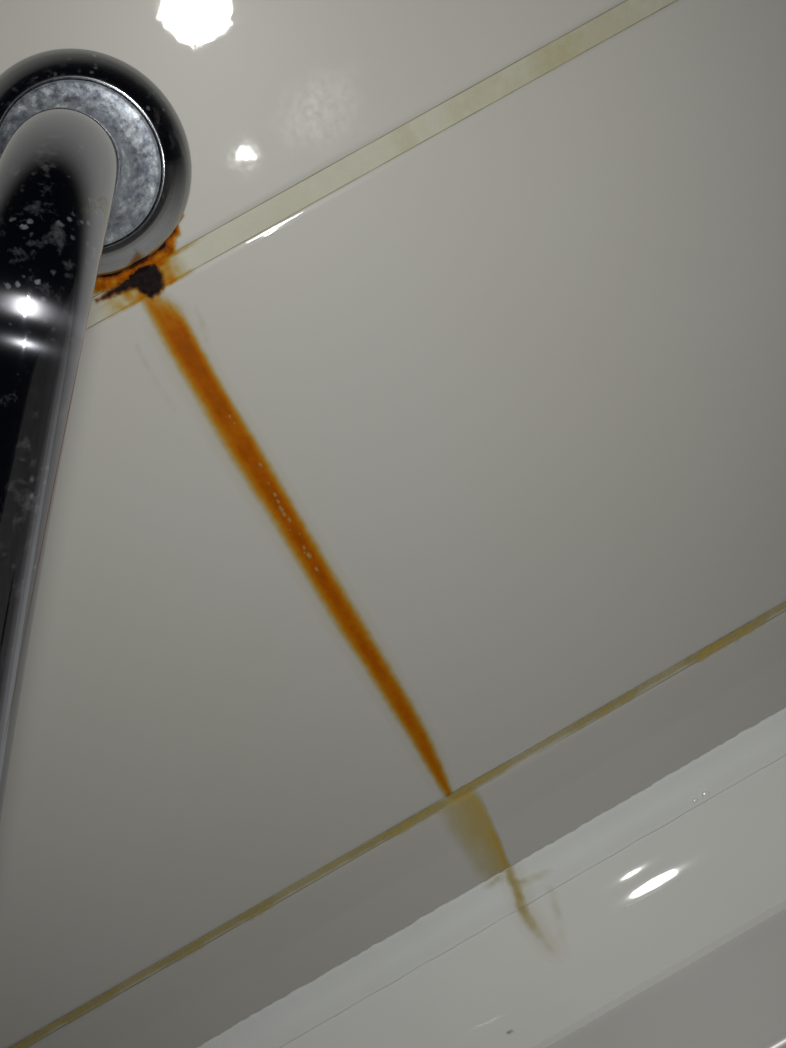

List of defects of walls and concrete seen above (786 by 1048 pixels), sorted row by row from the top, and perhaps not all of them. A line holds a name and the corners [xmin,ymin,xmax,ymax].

rust [94,213,532,926]